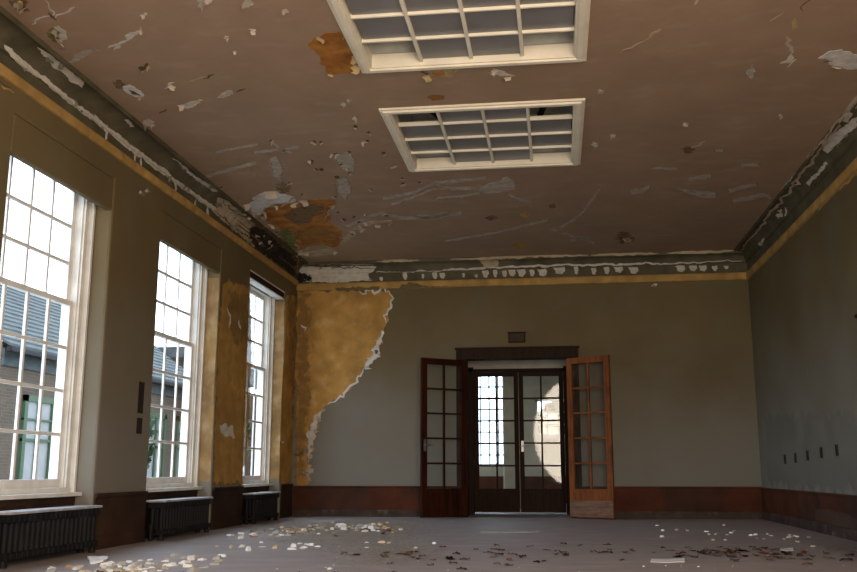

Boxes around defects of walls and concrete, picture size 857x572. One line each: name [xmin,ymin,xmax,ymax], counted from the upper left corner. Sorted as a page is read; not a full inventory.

peeling [37,13,147,87]
peeling [307,31,360,77]
peeling [421,69,461,83]
peeling [489,68,514,81]
peeling [819,50,857,70]
peeling [4,45,305,247]
peeling [293,96,857,486]